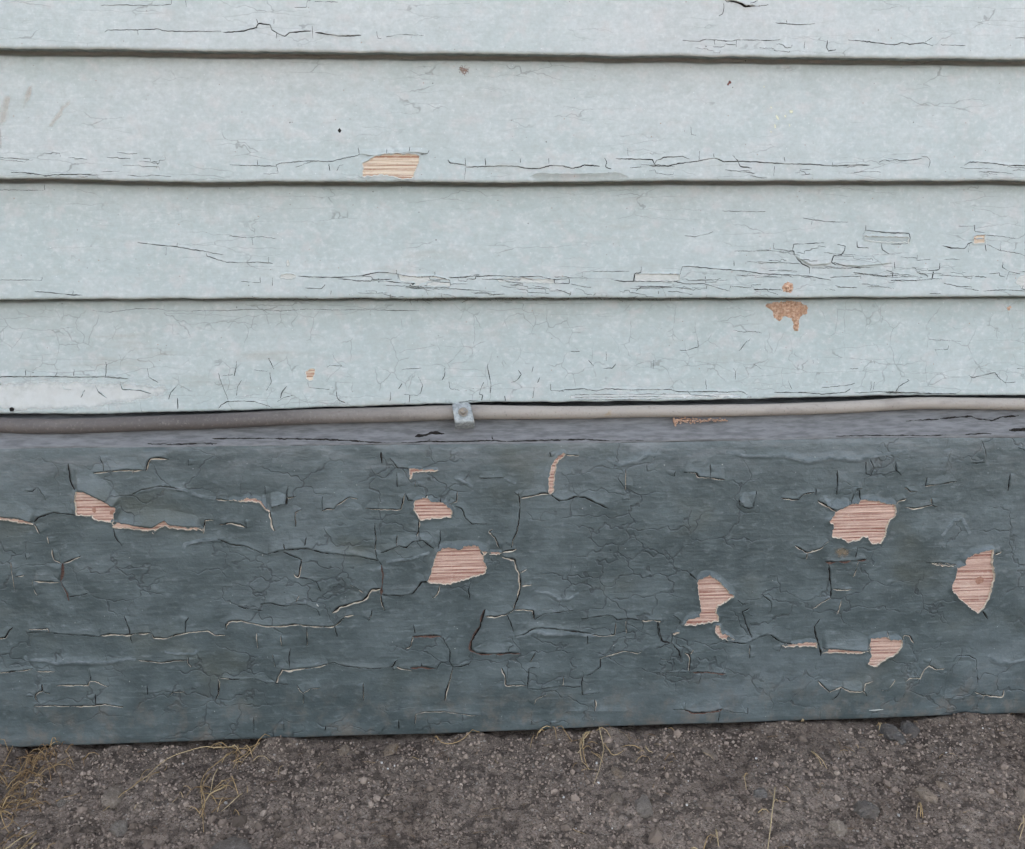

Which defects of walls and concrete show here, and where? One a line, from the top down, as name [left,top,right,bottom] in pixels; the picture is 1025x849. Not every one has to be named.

crack [101,0,424,39]
crack [683,0,965,53]
crack [0,150,171,191]
peeling [230,147,429,180]
crack [448,128,932,180]
crack [93,435,646,477]
peeling [0,464,296,546]
peeling [377,445,610,619]
peeling [795,480,906,559]
crack [0,489,667,725]
peeling [654,568,918,670]
peeling [926,543,1002,620]